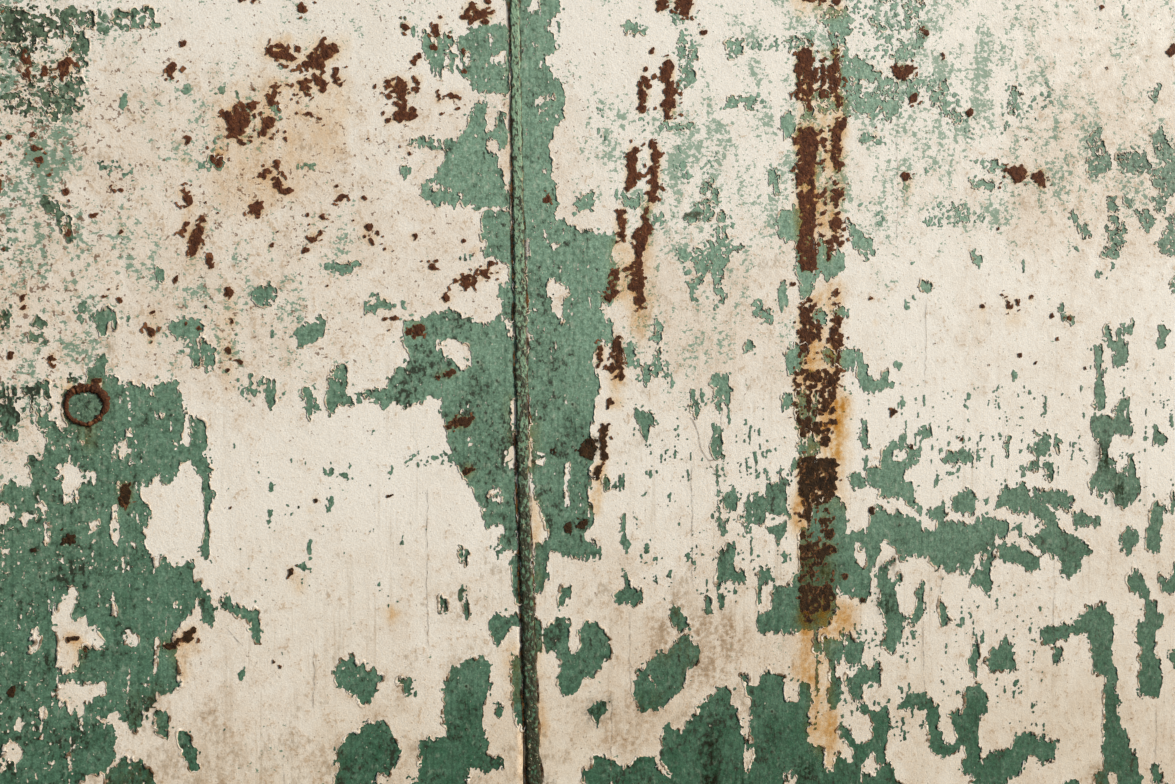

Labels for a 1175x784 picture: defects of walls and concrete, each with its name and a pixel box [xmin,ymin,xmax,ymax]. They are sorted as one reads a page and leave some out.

corrosion [219,36,348,146]
corrosion [373,15,452,127]
corrosion [601,138,666,312]
corrosion [637,47,684,122]
peeling [639,117,746,311]
corrosion [789,39,851,286]
peeling [720,0,977,145]
peeling [1068,124,1175,279]
peeling [0,353,264,784]
peeling [300,0,675,784]
corrosion [789,288,850,624]
peeling [580,317,1175,784]